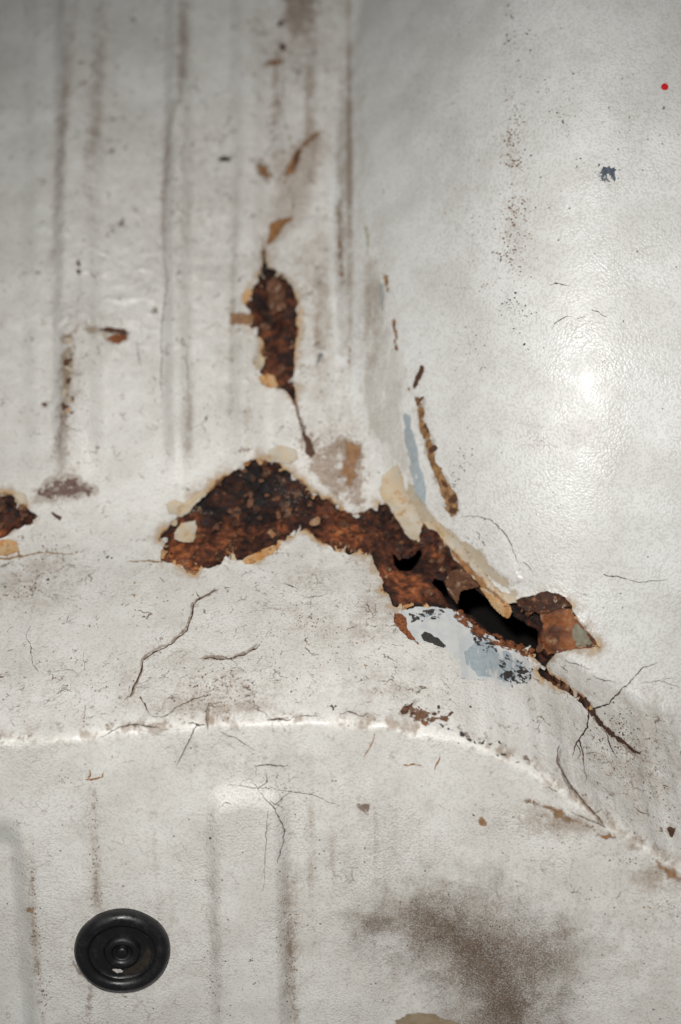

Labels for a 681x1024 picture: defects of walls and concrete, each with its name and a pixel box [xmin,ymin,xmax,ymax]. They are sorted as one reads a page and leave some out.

rust [230,217,311,406]
rust [297,415,366,503]
rust [403,352,473,517]
rust [0,478,113,607]
crack [102,590,338,886]
rust [178,602,331,731]
rust [400,703,454,726]
rust [445,569,479,604]
rust [514,591,598,655]
crack [549,660,676,828]
damp [395,1013,458,1024]